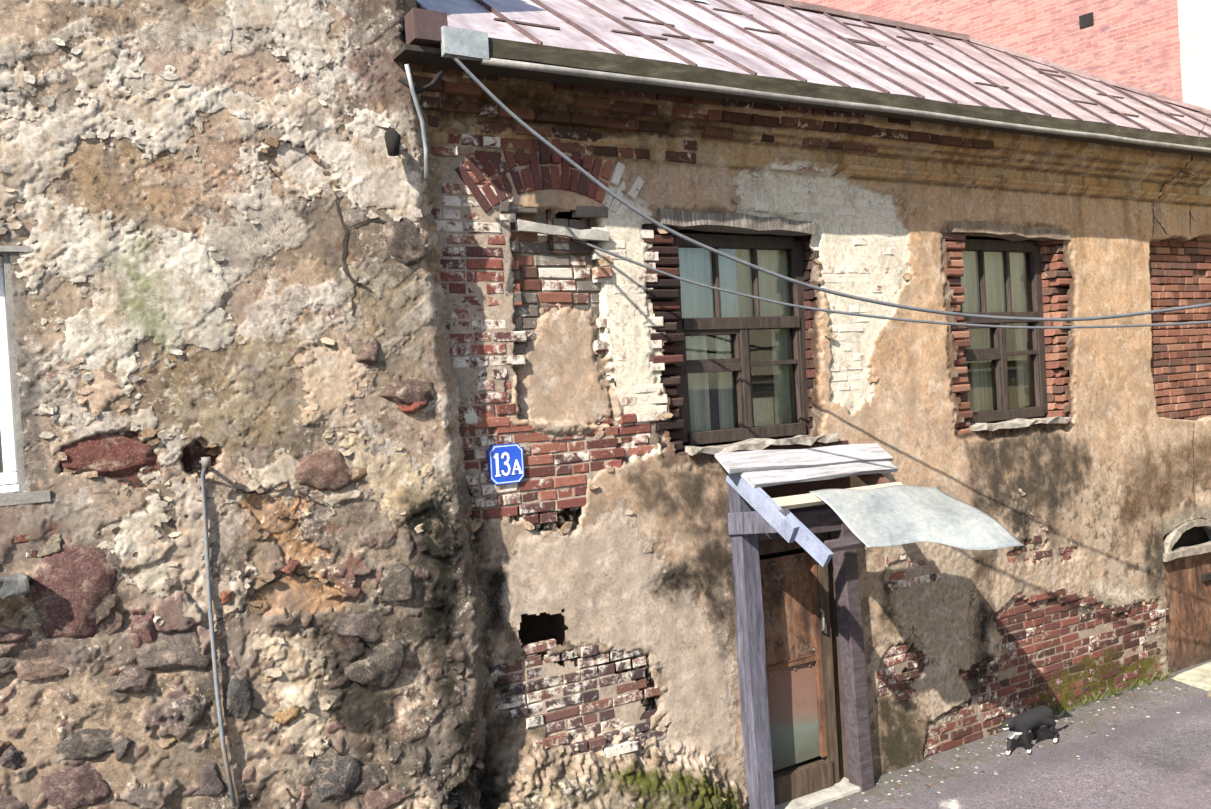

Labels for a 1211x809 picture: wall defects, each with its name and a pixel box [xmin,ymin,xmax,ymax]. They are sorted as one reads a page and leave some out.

crack [255,140,389,316]
spalling [732,160,913,413]
peeling [0,0,741,778]
damp [313,625,393,749]
damp [404,498,458,709]
spalling [447,762,484,809]
damp [453,679,514,809]
damp [477,570,507,620]
damp [625,460,735,620]
spalling [876,487,1169,758]
damp [965,427,1091,556]